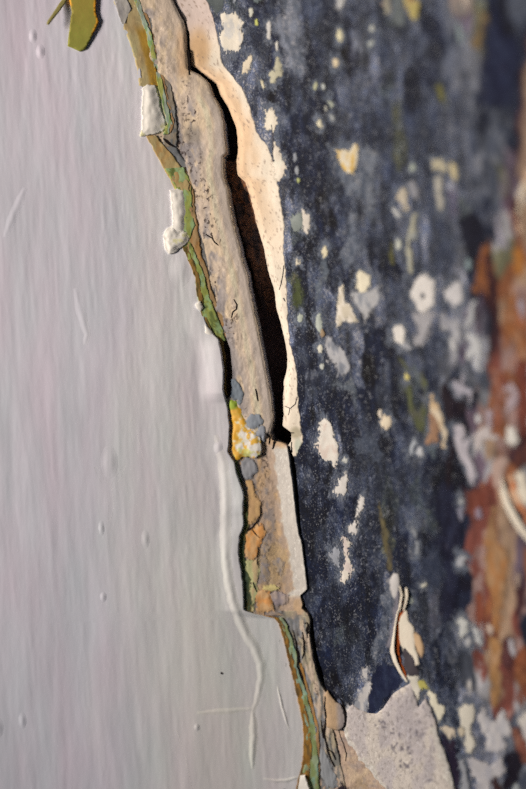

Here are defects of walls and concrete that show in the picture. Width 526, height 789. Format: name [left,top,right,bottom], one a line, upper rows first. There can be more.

peeling [47,0,99,51]
crack [173,0,302,535]
spalling [114,0,526,789]
corrosion [454,148,526,764]